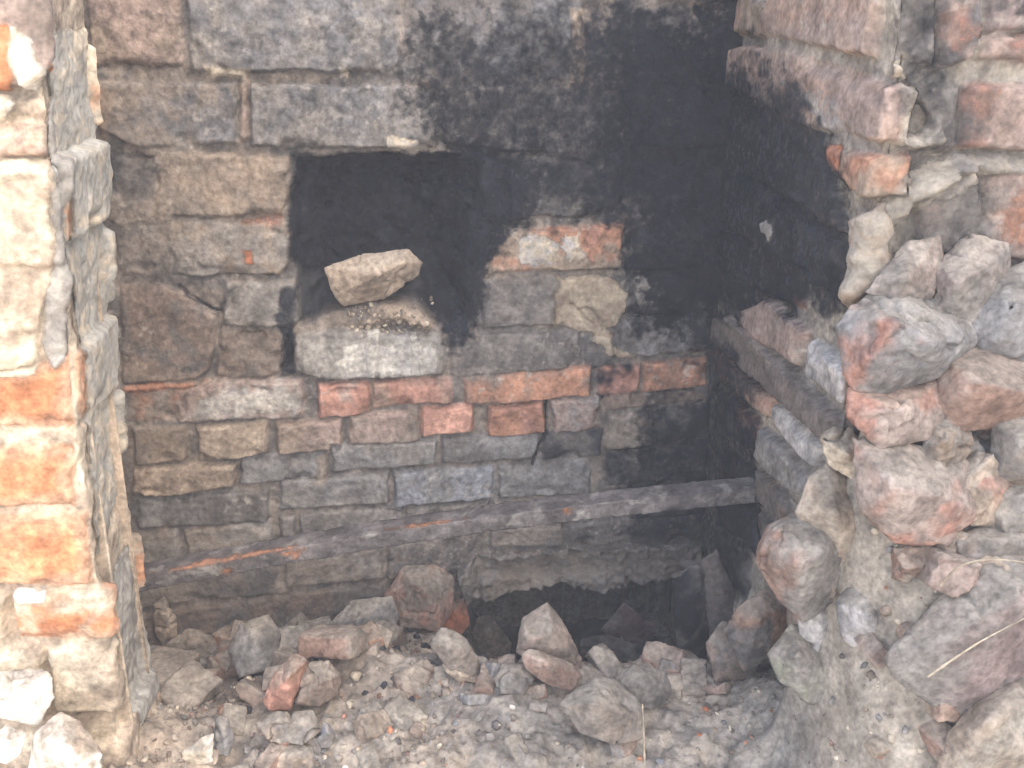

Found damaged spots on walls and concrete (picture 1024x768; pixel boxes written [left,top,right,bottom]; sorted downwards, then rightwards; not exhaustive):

crack [178,285,223,311]